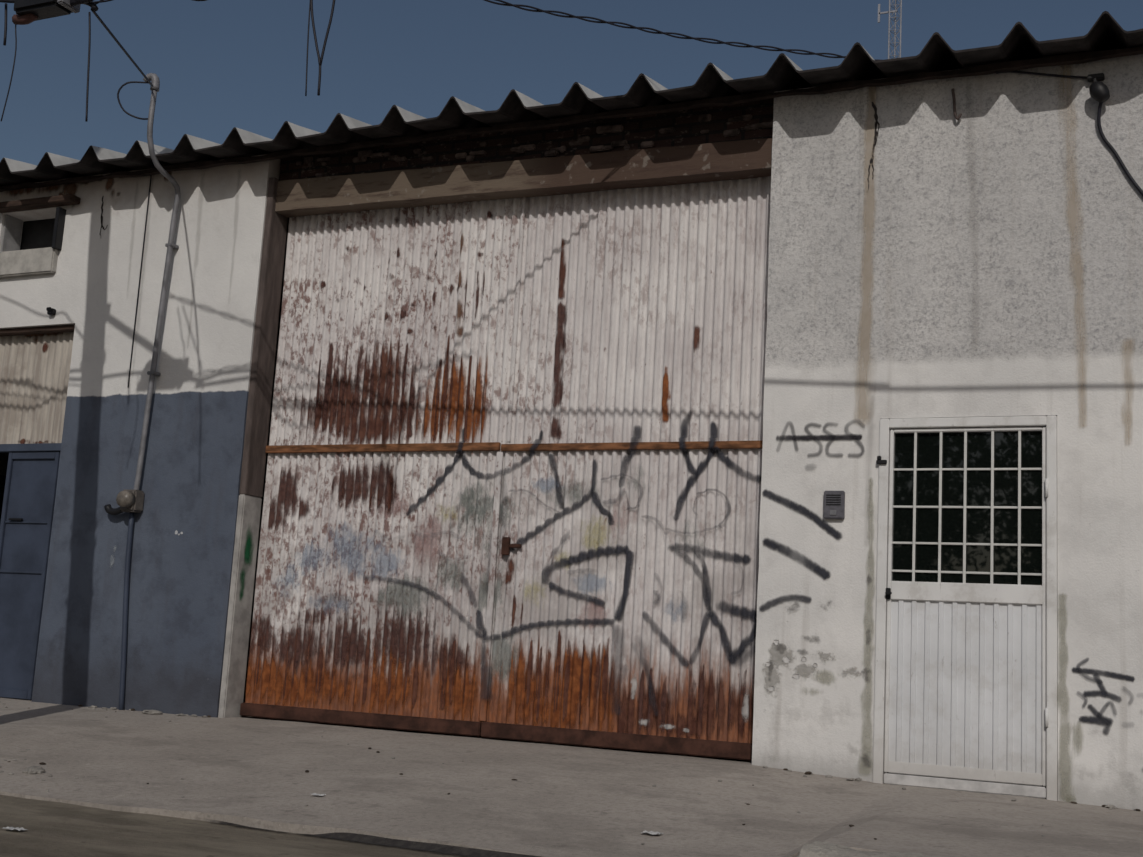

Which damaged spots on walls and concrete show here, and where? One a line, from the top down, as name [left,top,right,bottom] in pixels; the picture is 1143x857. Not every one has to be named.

crack [867,87,880,190]
rust [294,271,487,452]
rust [551,239,567,439]
rust [662,367,670,422]
rust [268,468,308,530]
rust [332,461,397,512]
rust [246,608,481,721]
rust [499,631,753,739]
peeling [763,640,834,693]